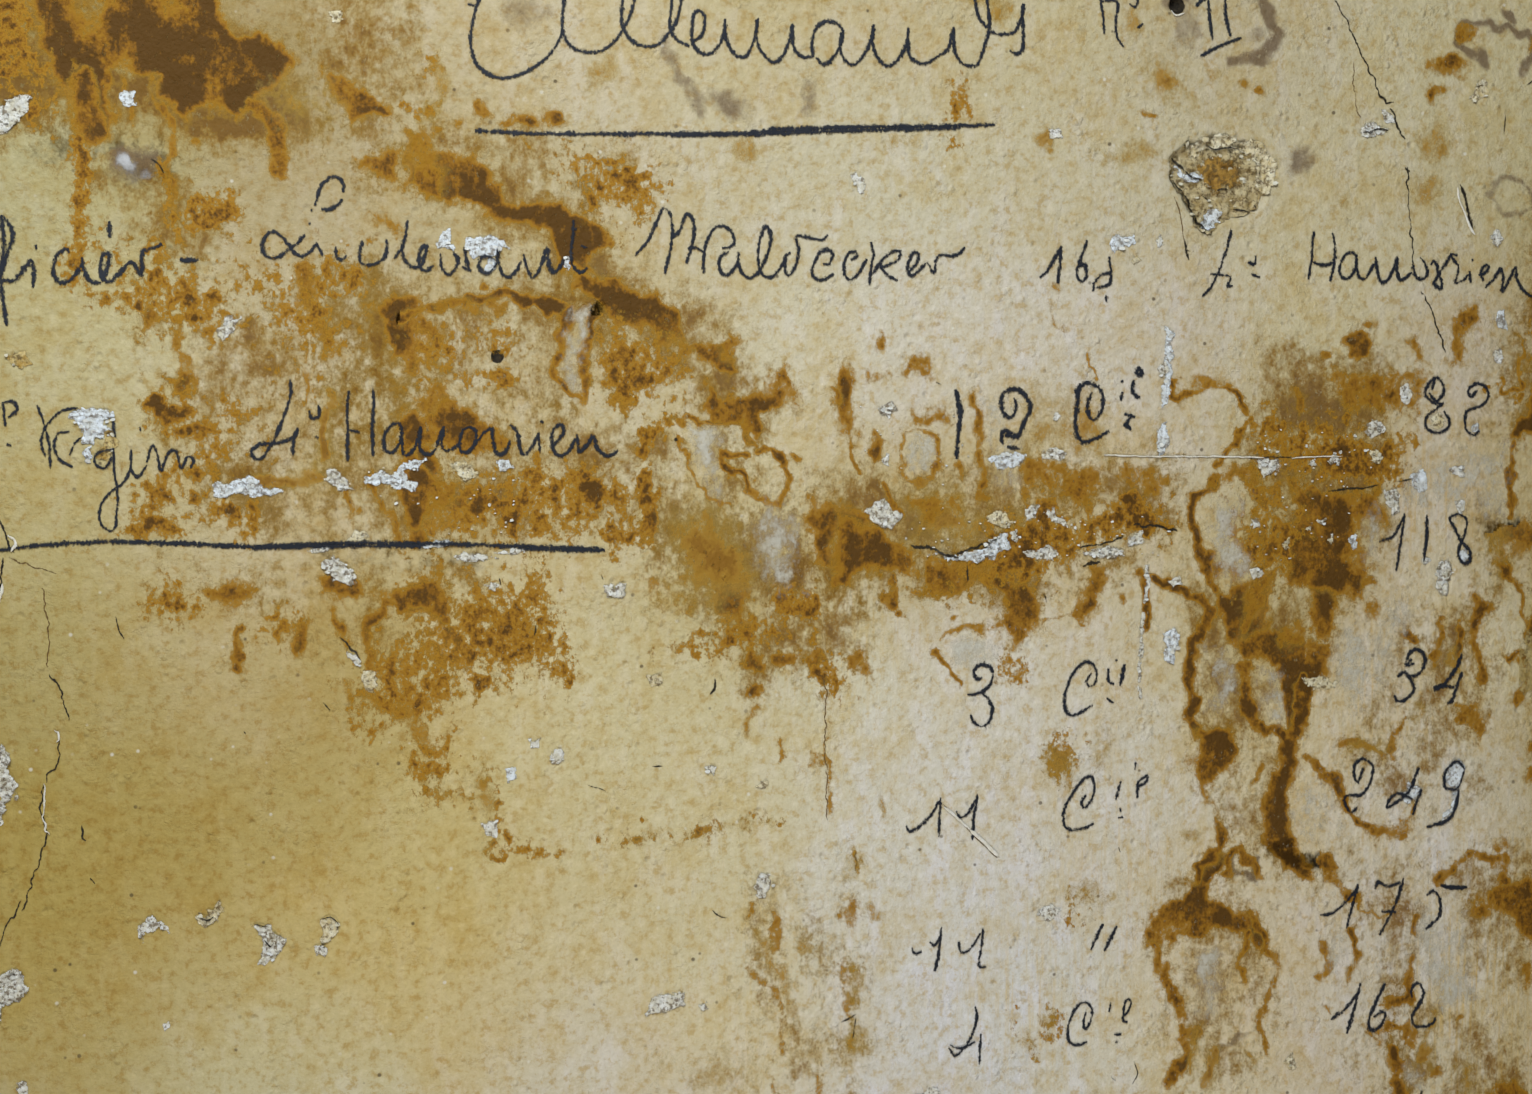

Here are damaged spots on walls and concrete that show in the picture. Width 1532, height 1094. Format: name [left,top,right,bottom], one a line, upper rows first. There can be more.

spalling [0,94,32,134]
spalling [1168,132,1279,243]
damp [329,255,613,407]
damp [676,413,802,581]
damp [867,408,950,490]
peeling [1156,326,1175,456]
damp [1168,375,1276,594]
peeling [864,498,1183,699]
peeling [0,744,19,826]
crack [0,521,69,946]
peeling [0,968,29,1021]
damp [1143,852,1281,1094]